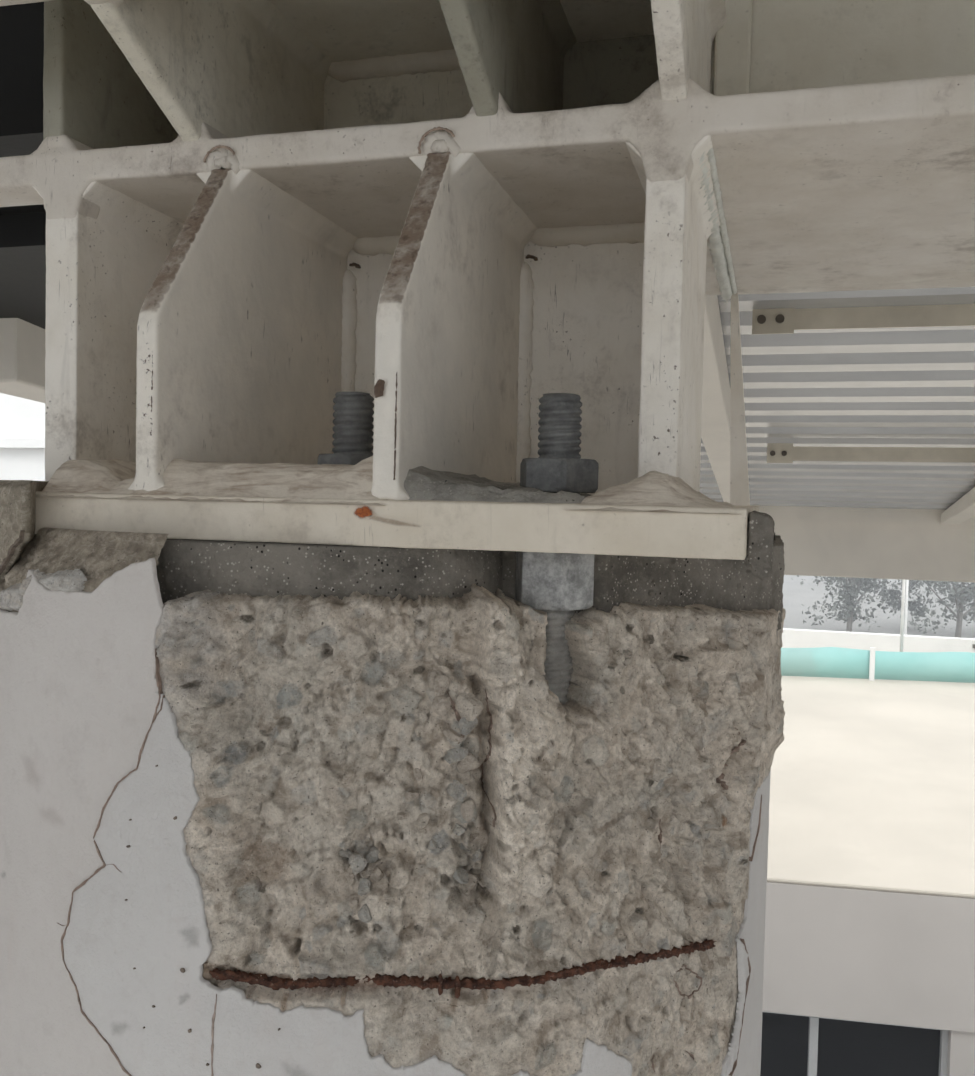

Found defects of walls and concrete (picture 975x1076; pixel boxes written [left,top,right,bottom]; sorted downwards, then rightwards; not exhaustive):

corrosion [354,506,372,518]
spalling [0,527,169,612]
crack [57,648,165,1076]
spalling [155,584,786,1076]
crack [210,994,218,1076]